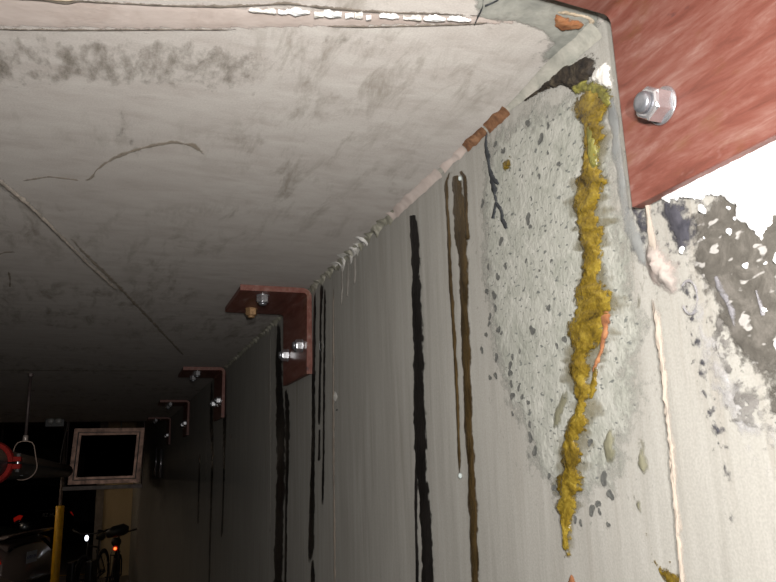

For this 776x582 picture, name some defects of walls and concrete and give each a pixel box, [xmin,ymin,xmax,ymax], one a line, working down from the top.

crack [0,25,236,33]
crack [22,0,498,28]
spalling [524,53,611,101]
rust [439,106,510,173]
crack [484,133,507,229]
peeling [661,141,776,240]
hole [485,289,503,336]
water stain [410,215,434,582]
hole [508,349,530,405]
water stain [268,325,290,582]
water stain [308,285,337,582]